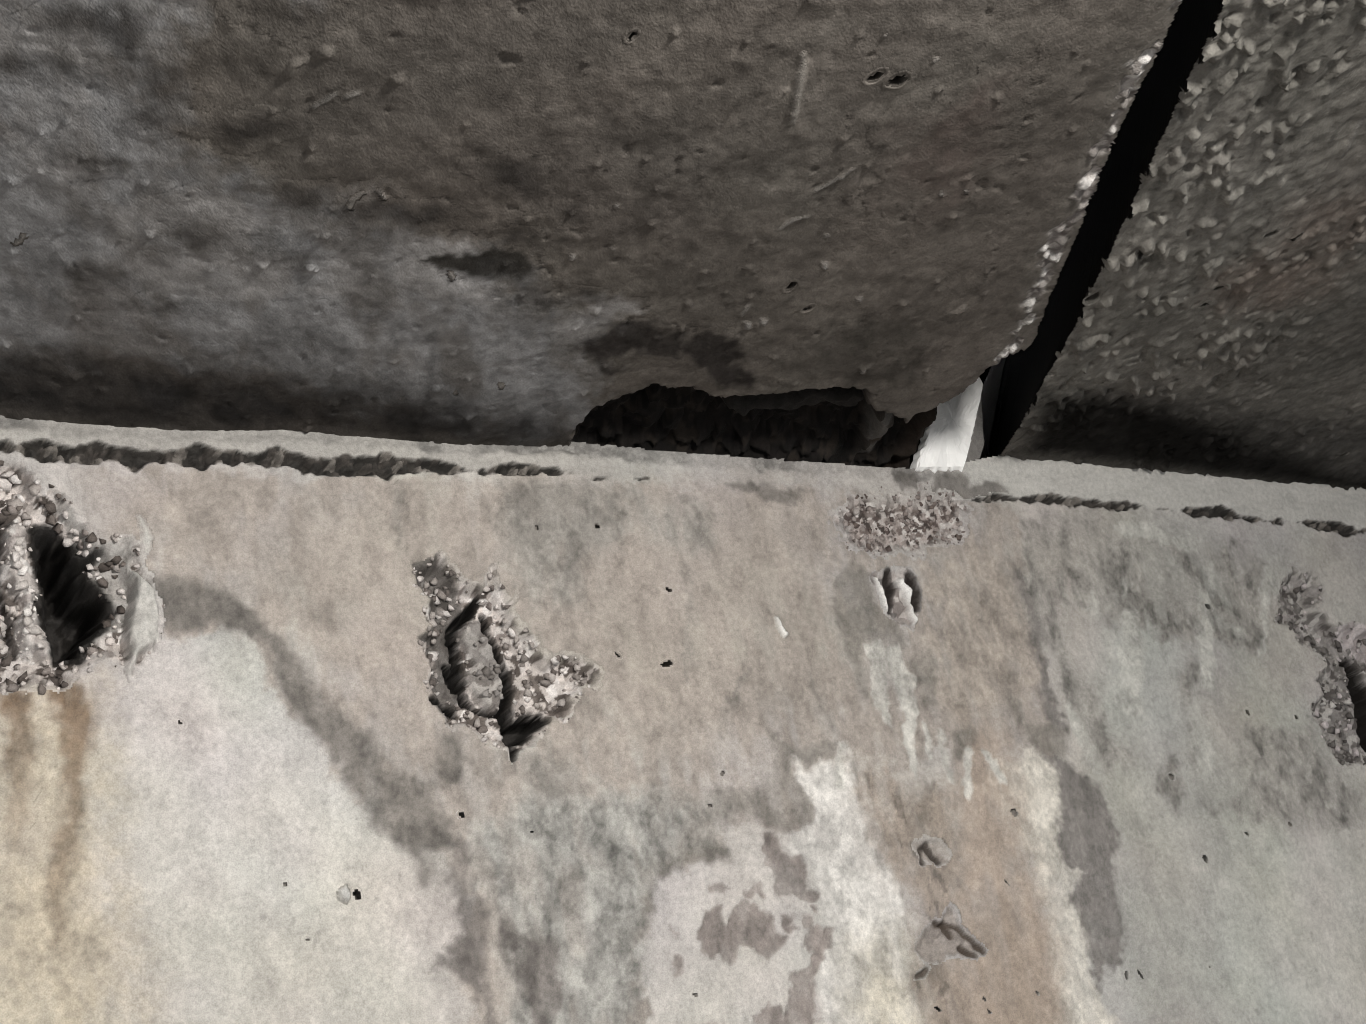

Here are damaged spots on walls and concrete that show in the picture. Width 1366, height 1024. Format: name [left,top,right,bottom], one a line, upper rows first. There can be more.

spalling [0,456,166,695]